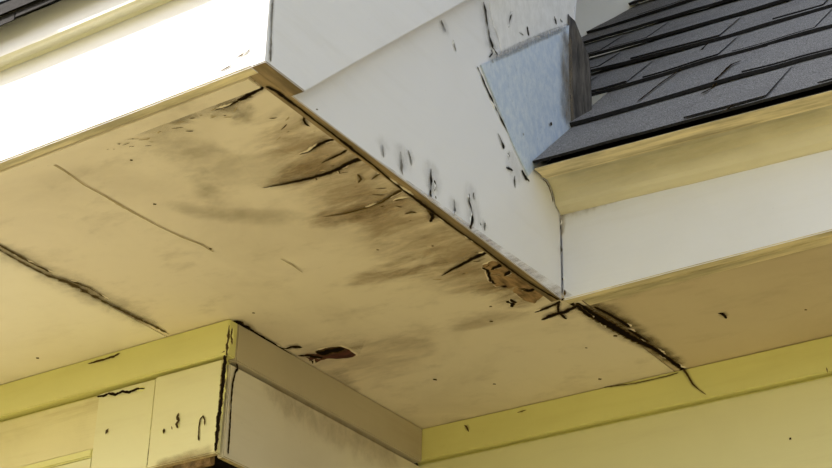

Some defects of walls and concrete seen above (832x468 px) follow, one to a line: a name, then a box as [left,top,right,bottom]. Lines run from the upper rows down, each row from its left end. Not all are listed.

crack [53,165,214,252]
crack [0,245,168,334]
peeling [481,260,543,307]
crack [534,298,594,320]
crack [88,353,120,364]
crack [97,387,145,397]
crack [222,325,238,454]
crack [604,369,706,395]
crack [162,413,205,440]